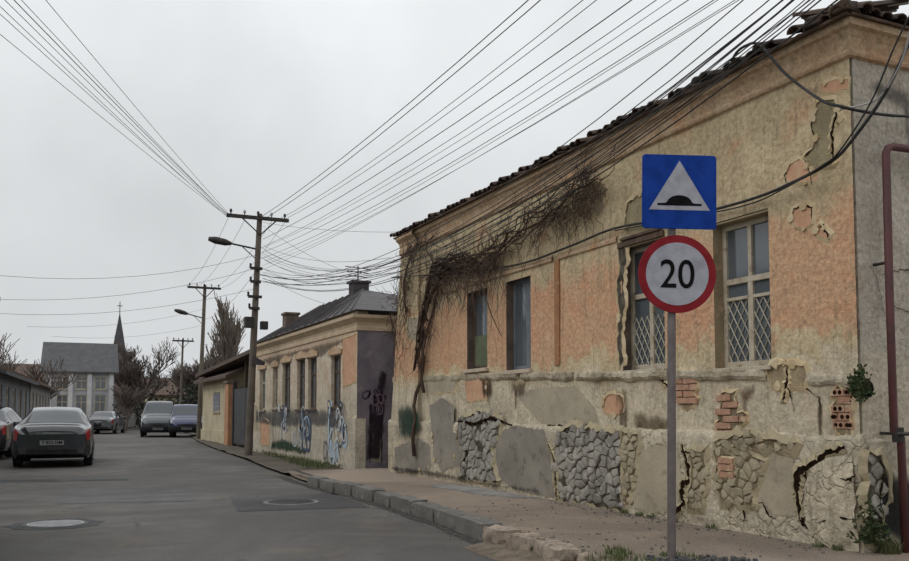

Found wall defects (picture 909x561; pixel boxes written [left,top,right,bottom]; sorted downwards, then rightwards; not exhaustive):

peeling [784,76,851,188]
peeling [623,189,653,235]
peeling [787,200,835,245]
flaking render [394,372,501,482]
flaking render [551,423,638,509]
crack [676,444,698,520]
flaking render [676,366,701,412]
flaking render [686,387,764,512]
crack [742,441,852,529]
crack [780,365,821,415]
flaking render [828,385,858,436]
crack [877,456,885,517]